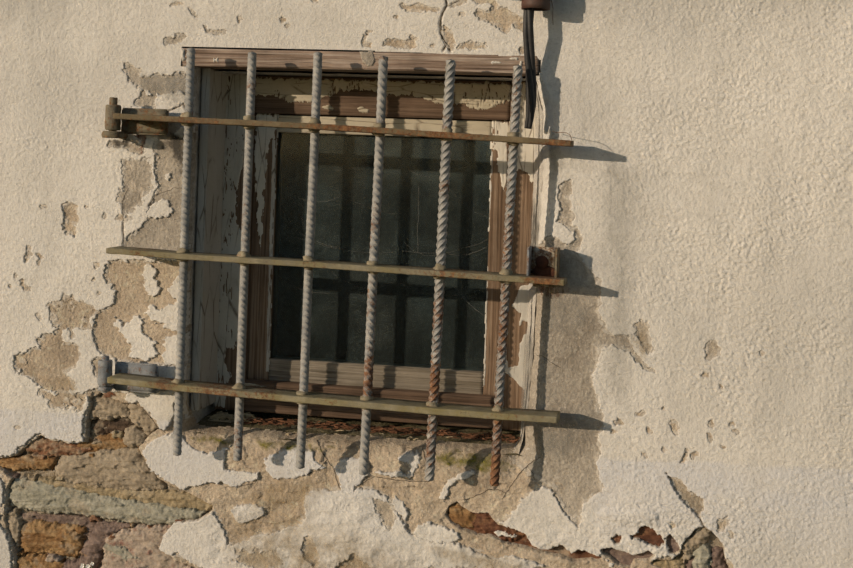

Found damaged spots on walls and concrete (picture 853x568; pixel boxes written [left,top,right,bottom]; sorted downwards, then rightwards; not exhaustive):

peeling [383,35,417,50]
peeling [394,3,440,19]
crack [440,0,456,51]
peeling [430,25,487,51]
peeling [451,0,523,34]
spalling [0,62,734,568]
crack [463,457,540,500]